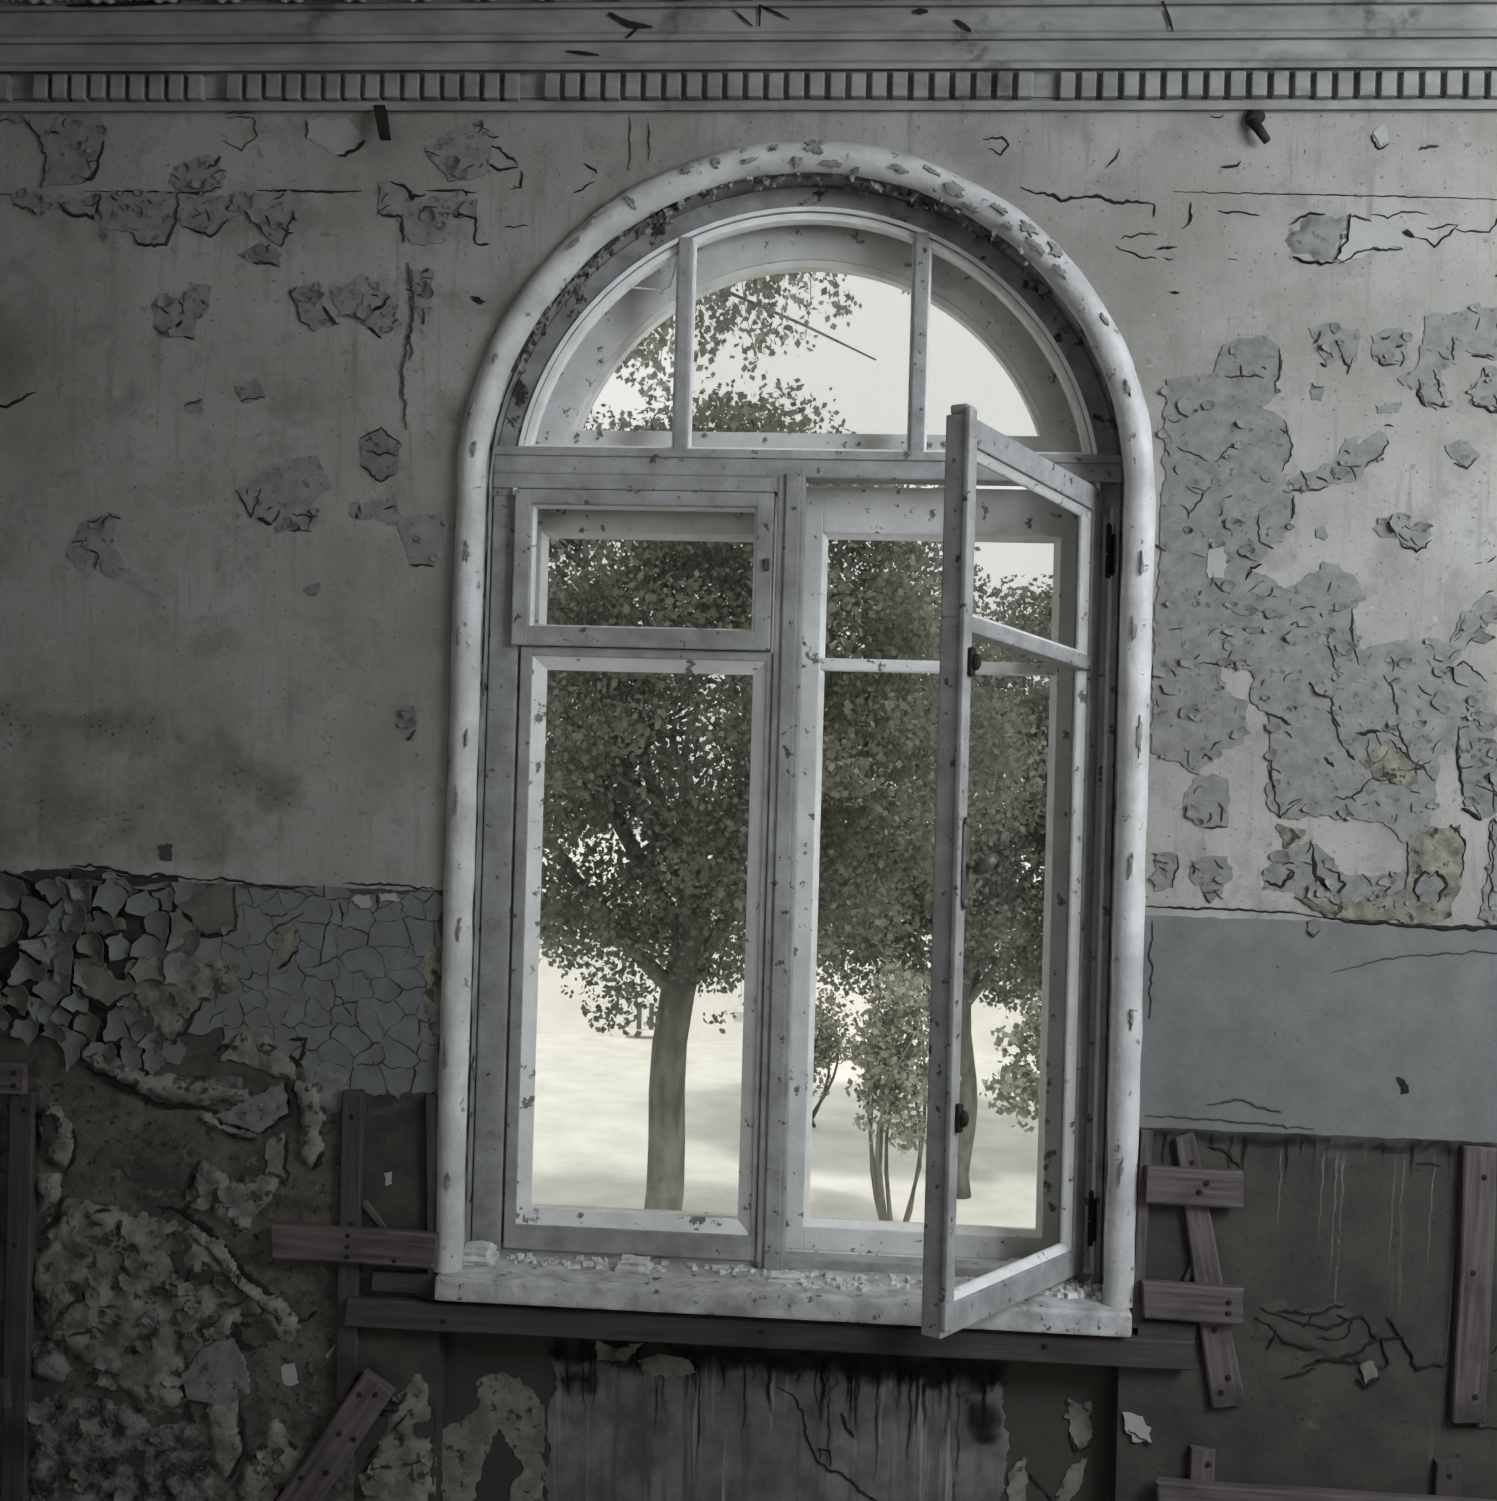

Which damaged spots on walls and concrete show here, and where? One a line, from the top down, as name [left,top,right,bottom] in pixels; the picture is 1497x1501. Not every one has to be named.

crack [984,136,1010,156]
crack [1021,149,1497,294]
peeling [289,263,445,567]
peeling [1139,303,1497,651]
peeling [1261,590,1497,924]
peeling [1128,852,1233,903]
peeling [0,844,462,1131]
flaking render [358,1372,546,1501]
water stain [549,1339,1003,1457]
crack [777,1387,877,1501]
peeling [1122,1412,1152,1444]
crack [1256,1304,1497,1430]